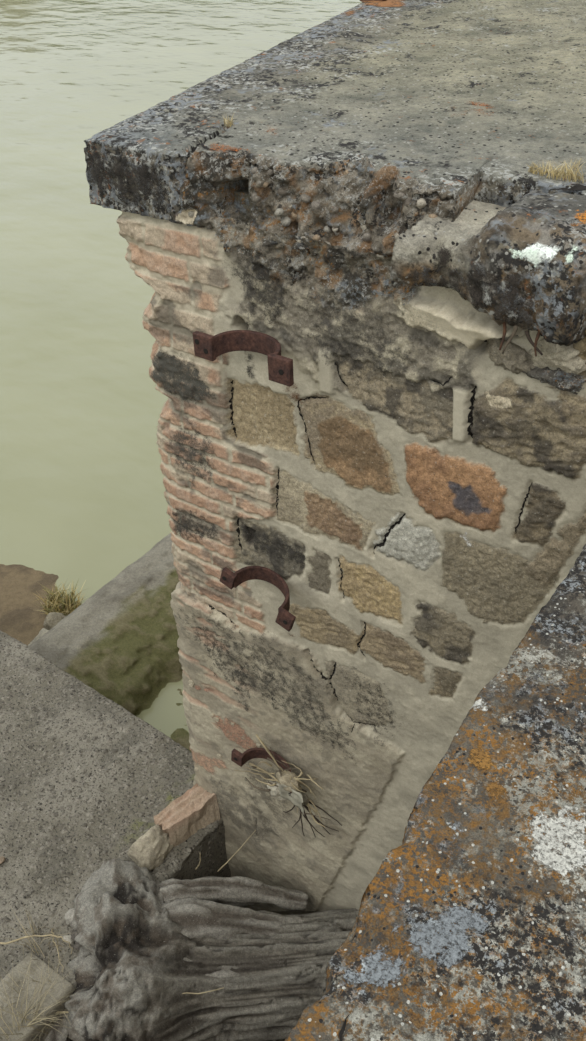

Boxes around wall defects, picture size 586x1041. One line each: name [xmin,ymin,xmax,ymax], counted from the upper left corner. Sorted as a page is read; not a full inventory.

rust [346,0,403,14]
crack [550,184,586,192]
spalling [175,147,480,257]